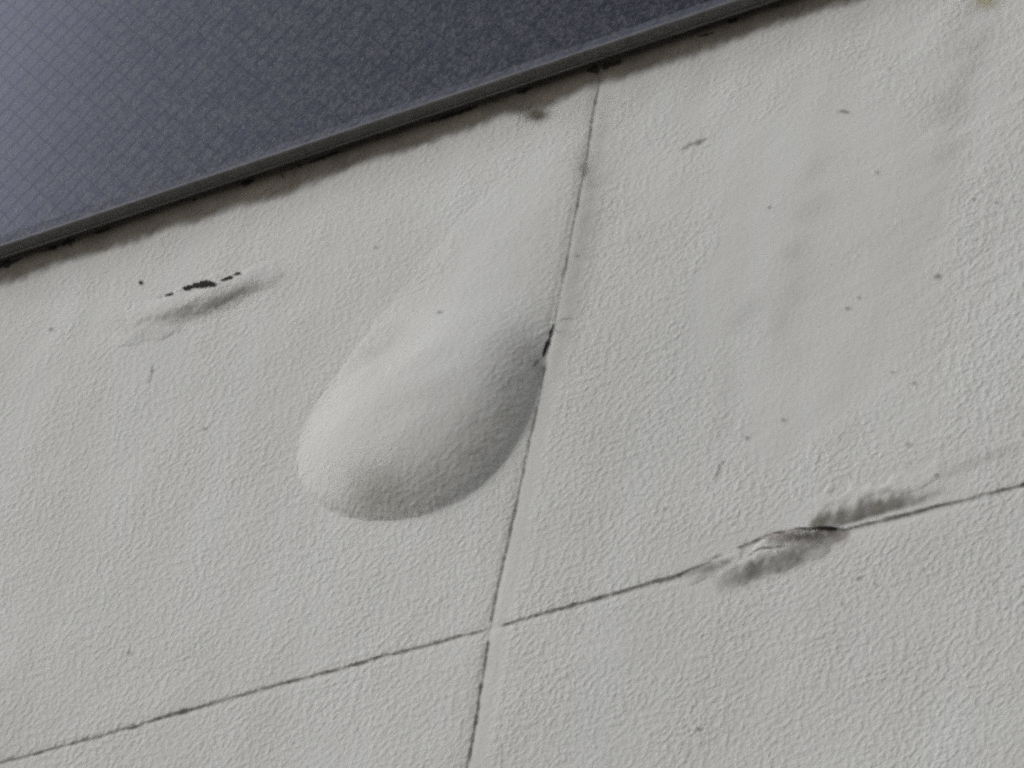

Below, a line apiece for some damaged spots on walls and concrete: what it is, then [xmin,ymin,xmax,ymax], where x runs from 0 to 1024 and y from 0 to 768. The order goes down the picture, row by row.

crack [563,83,599,274]
spalling [164,272,240,296]
crack [241,310,708,768]
peeling [682,524,847,587]
crack [841,500,962,530]
crack [993,482,1024,492]
crack [0,704,208,763]